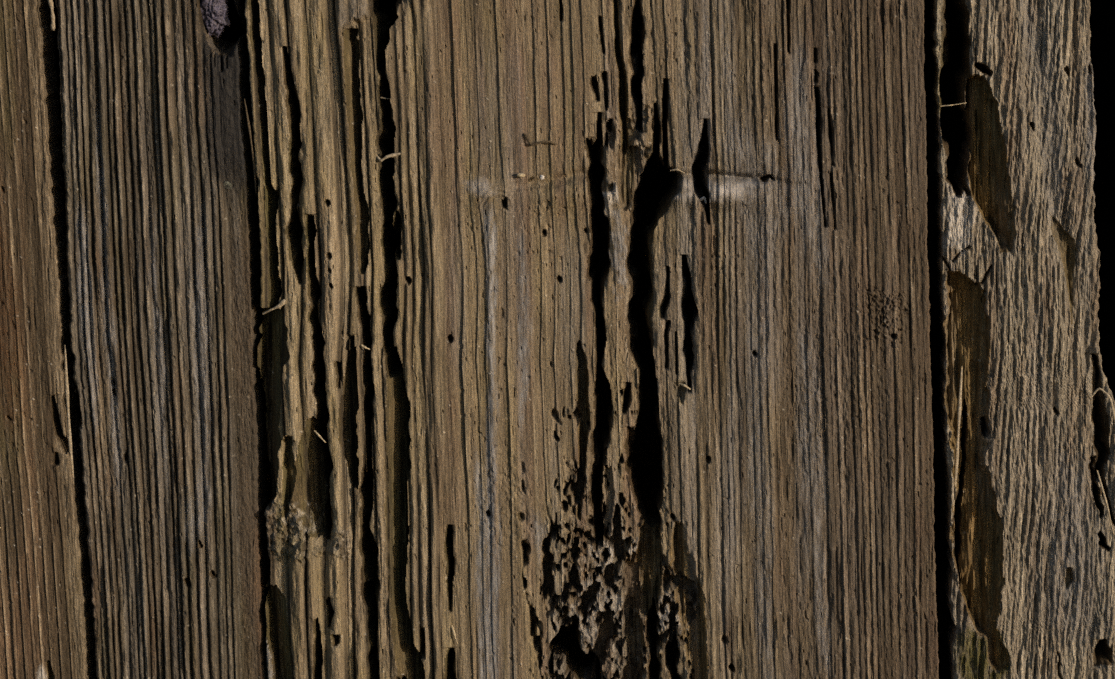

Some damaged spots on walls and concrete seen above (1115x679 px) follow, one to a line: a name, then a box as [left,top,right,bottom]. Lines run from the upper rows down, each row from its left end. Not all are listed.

crack [557,0,565,21]
crack [584,0,711,545]
crack [275,0,403,679]
crack [622,597,681,679]
crack [1055,651,1063,679]